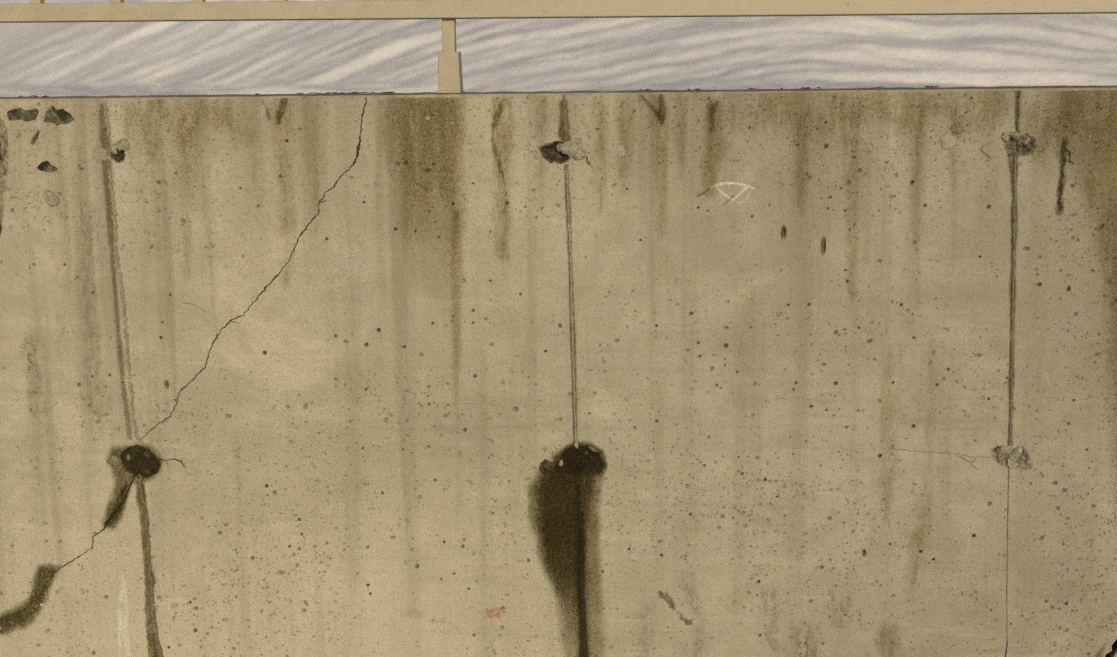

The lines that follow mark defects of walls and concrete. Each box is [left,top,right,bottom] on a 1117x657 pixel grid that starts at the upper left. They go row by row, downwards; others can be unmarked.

spalling [0,104,76,241]
crack [0,98,367,622]
water stain [544,445,604,657]
crack [1103,637,1117,657]